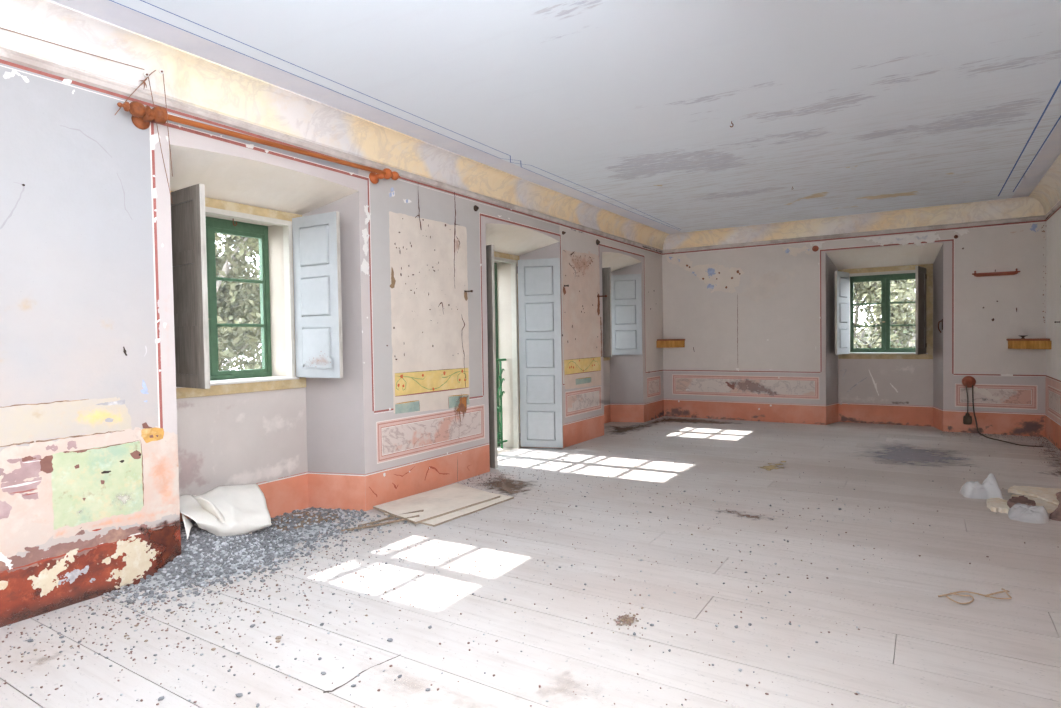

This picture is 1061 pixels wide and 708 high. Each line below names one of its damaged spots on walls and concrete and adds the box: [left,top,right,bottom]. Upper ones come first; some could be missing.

peeling [3,69,29,83]
crack [438,192,466,386]
corrosion [455,395,468,422]
flaking render [0,418,178,597]